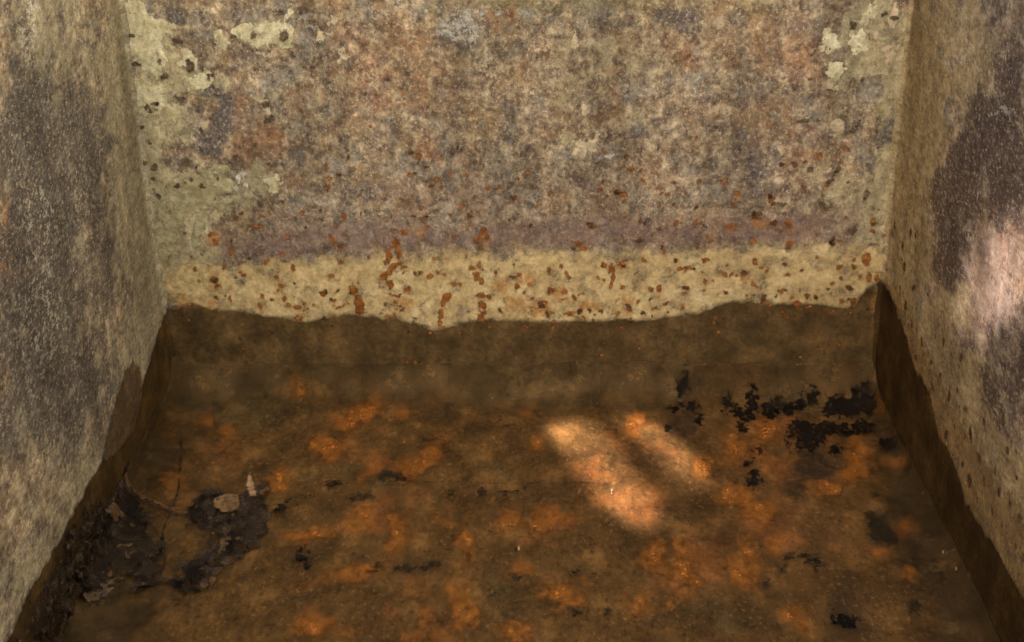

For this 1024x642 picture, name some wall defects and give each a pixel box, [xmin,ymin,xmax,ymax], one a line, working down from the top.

peeling [125,0,218,145]
peeling [213,3,296,58]
peeling [249,86,275,124]
peeling [143,154,249,261]
peeling [257,173,284,208]
corrosion [407,150,467,190]
corrosion [190,204,690,357]
corrosion [622,189,883,319]
corrosion [310,395,380,461]
leakage [7,240,1024,642]
corrosion [945,418,1021,528]
corrosion [169,469,315,594]